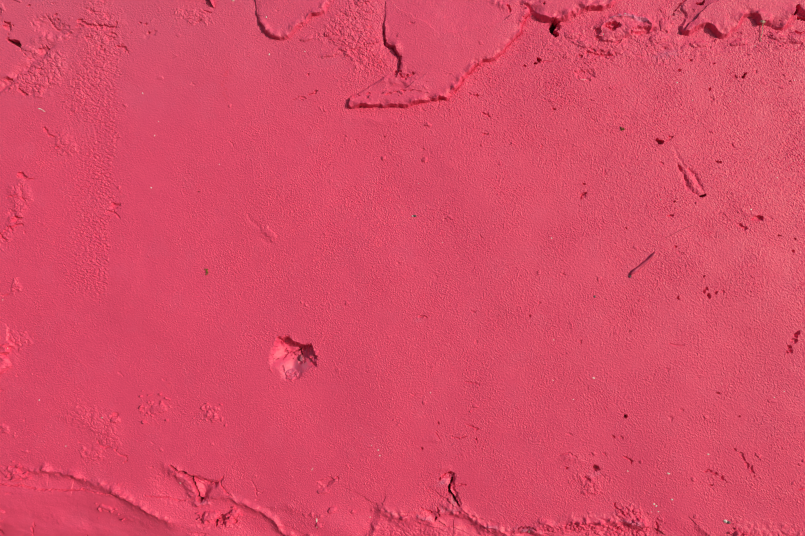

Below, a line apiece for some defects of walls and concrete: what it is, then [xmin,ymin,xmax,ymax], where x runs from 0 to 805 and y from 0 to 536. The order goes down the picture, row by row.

spalling [255,0,395,82]
spalling [534,6,805,83]
crack [420,464,467,522]
peeling [513,524,546,536]